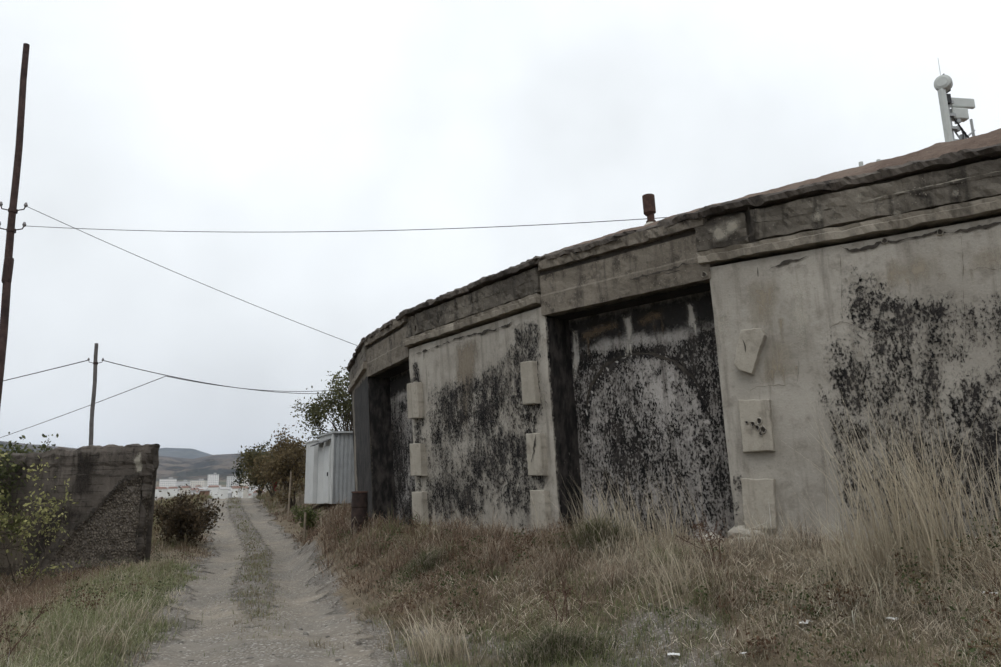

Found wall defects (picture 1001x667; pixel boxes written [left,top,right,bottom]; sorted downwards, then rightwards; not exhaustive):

leakage [688,305,696,333]
crack [840,222,1001,331]